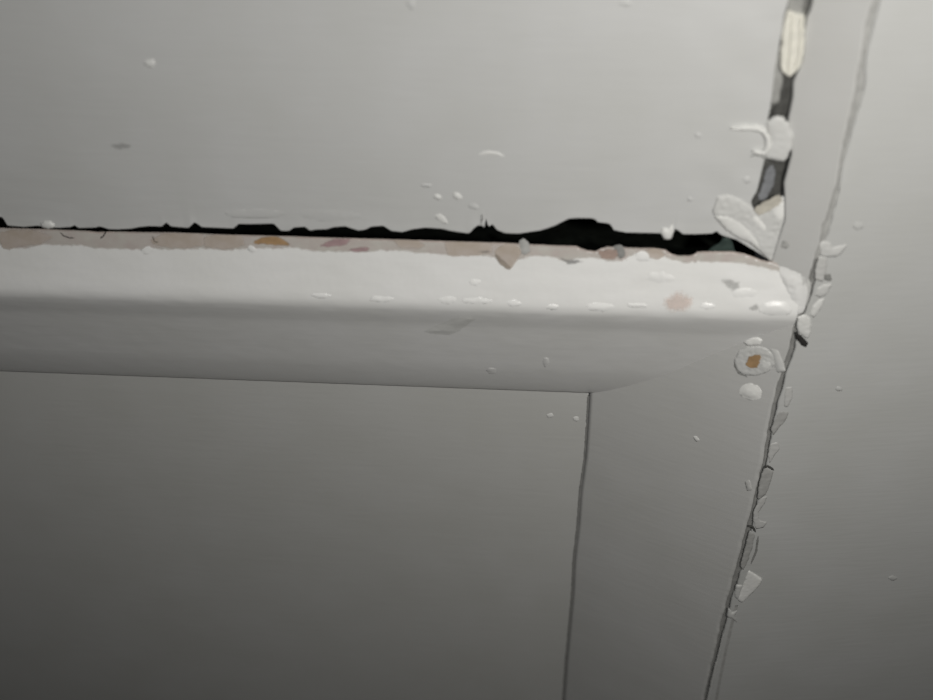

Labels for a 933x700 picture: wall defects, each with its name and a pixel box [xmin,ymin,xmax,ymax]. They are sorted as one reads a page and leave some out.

peeling [731,115,794,161]
crack [0,215,756,258]
spalling [0,195,785,271]
spalling [734,337,786,377]
crack [704,0,879,700]
crack [562,395,589,700]
peeling [727,571,762,622]